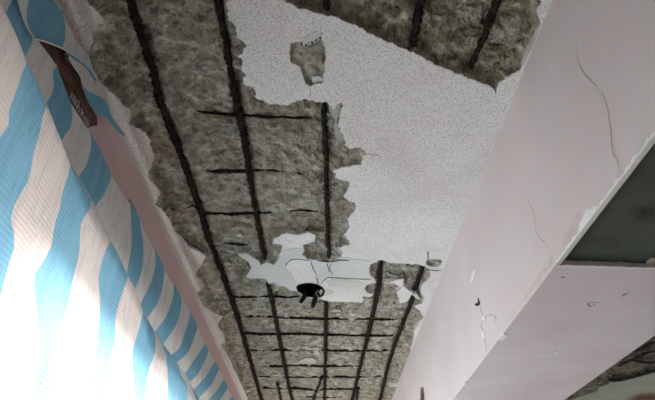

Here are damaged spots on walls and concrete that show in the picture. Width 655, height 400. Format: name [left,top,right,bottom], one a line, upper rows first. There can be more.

spalling [285,0,541,92]
crack [575,42,619,168]
spalling [88,0,442,400]
spalling [556,130,655,264]
spalling [565,336,655,400]